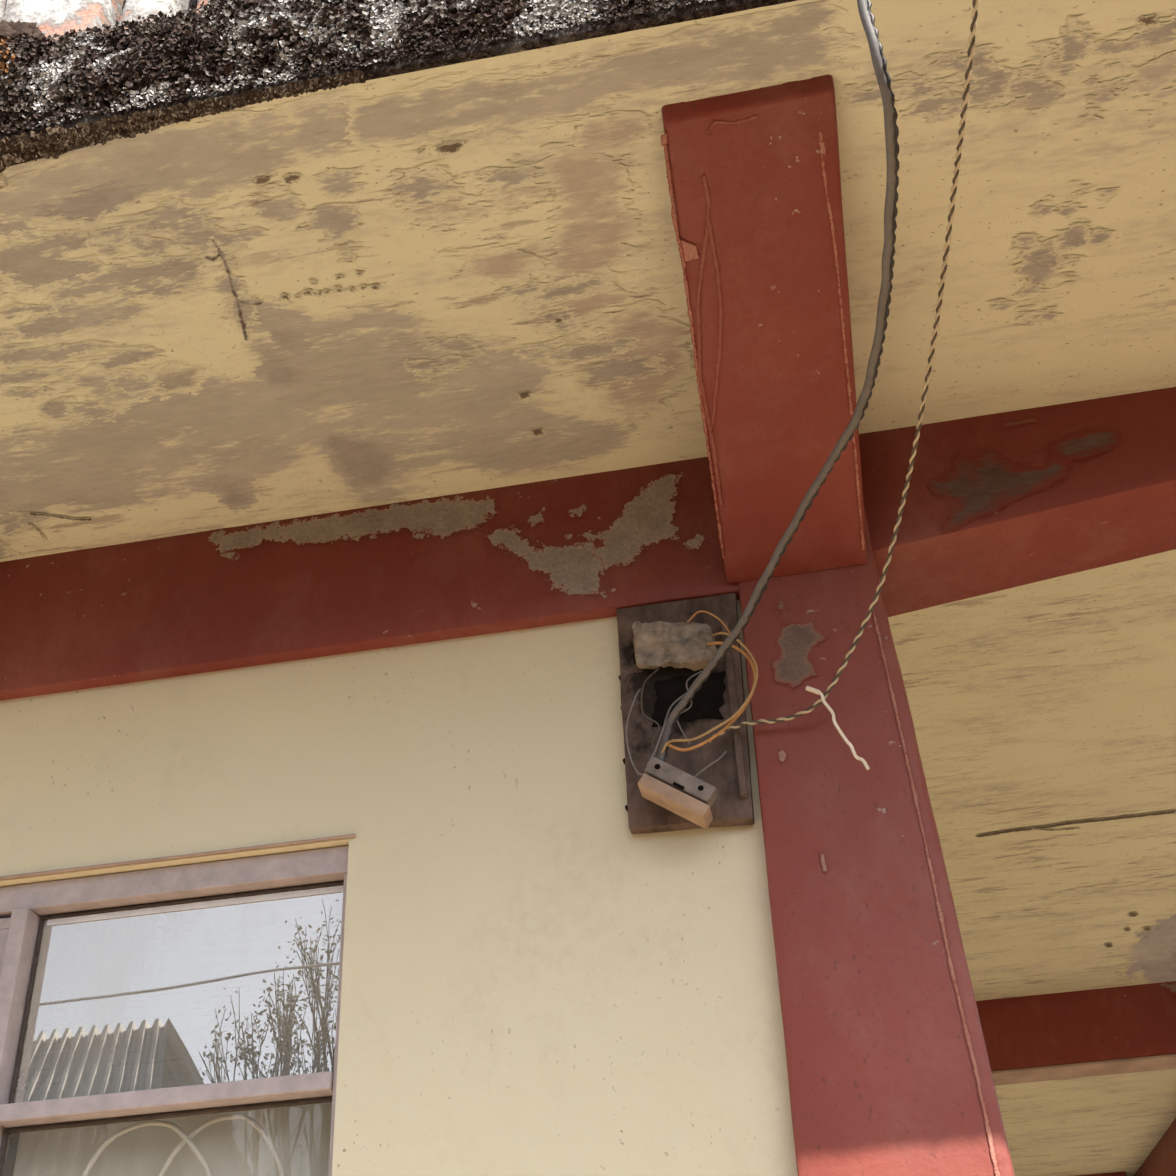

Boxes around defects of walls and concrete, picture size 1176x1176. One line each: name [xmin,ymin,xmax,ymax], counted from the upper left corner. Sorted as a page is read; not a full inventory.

crack [205,239,263,341]
peeling [0,0,865,600]
peeling [771,599,827,689]
crack [975,810,1176,838]
damp [1113,904,1176,984]